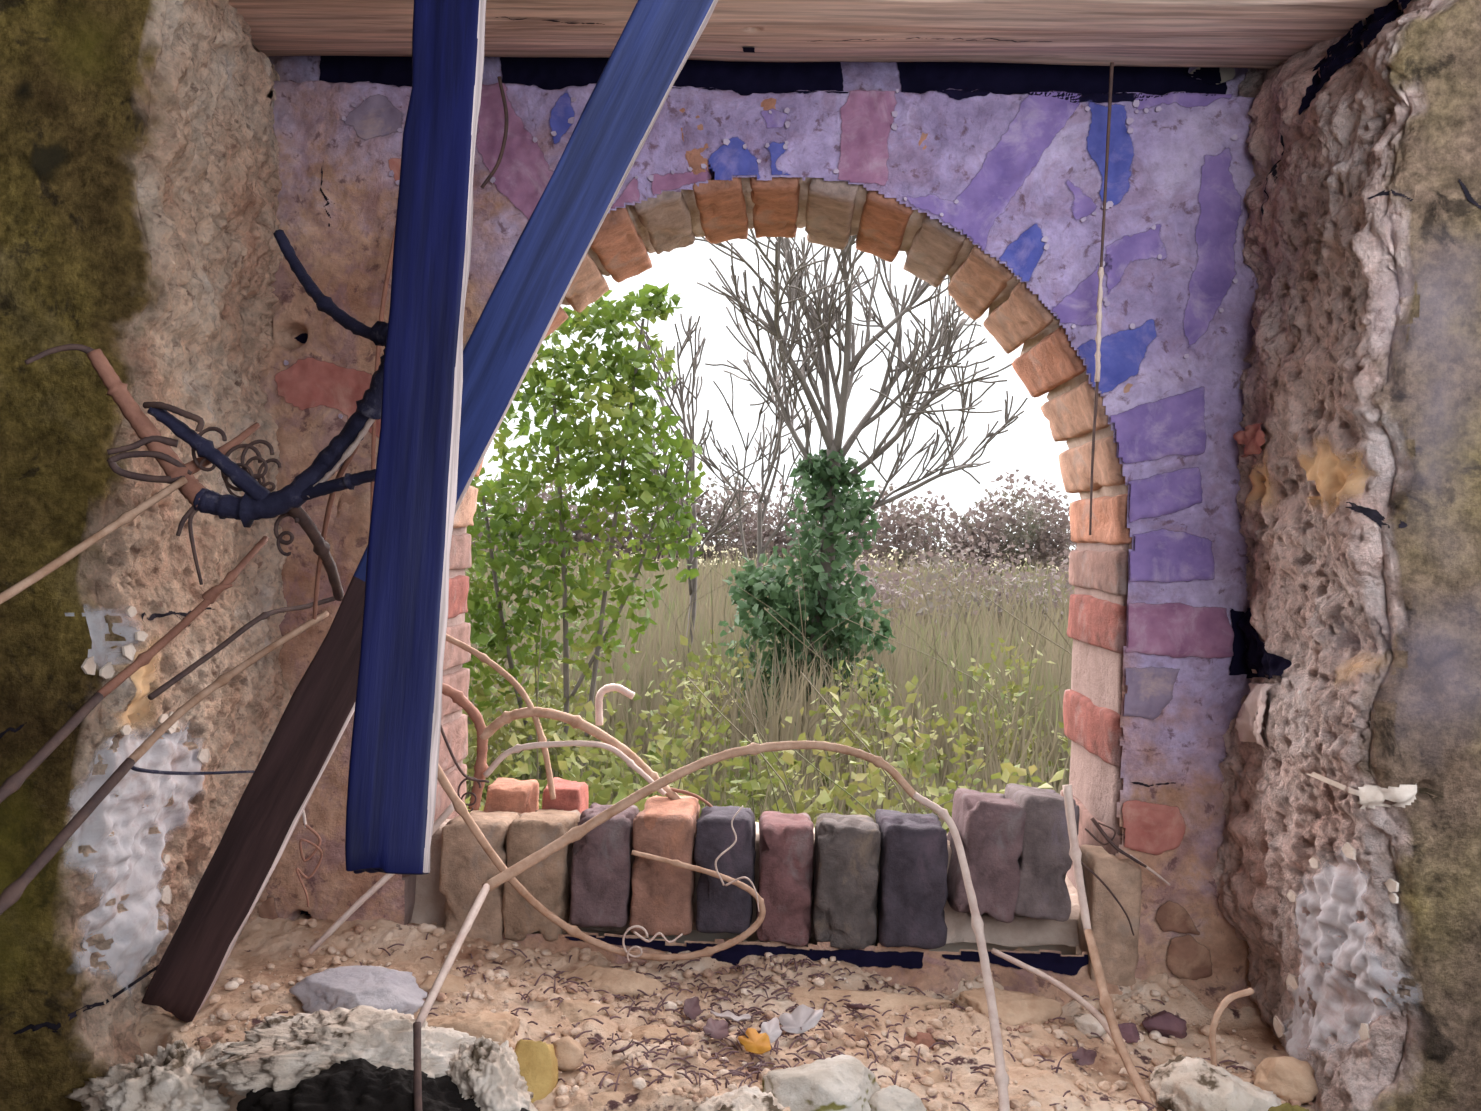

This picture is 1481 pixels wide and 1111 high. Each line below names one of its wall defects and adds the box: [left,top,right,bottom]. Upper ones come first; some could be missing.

crack [1367,189,1413,201]
crack [1458,179,1481,209]
flaking render [1233,422,1265,457]
damp [81,606,148,679]
damp [158,711,179,734]
flaking render [1235,683,1273,749]
flaking render [1307,772,1417,809]
damp [1309,857,1320,869]
damp [1342,842,1356,860]
damp [159,885,172,904]
damp [1384,879,1399,904]
damp [1273,1016,1285,1038]